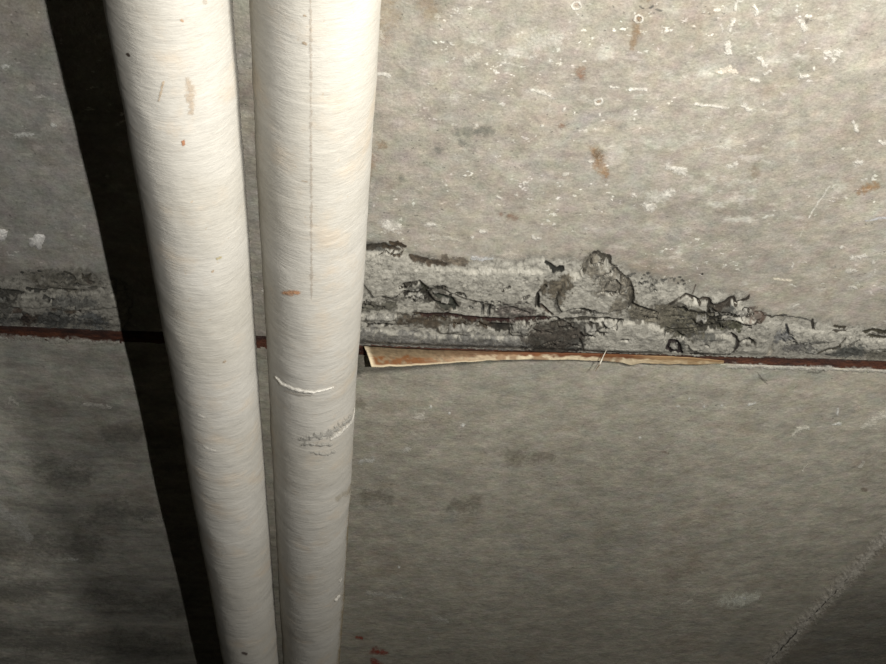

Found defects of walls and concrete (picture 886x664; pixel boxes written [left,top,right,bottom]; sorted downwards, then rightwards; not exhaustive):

spalling [0,269,133,331]
spalling [359,241,787,367]